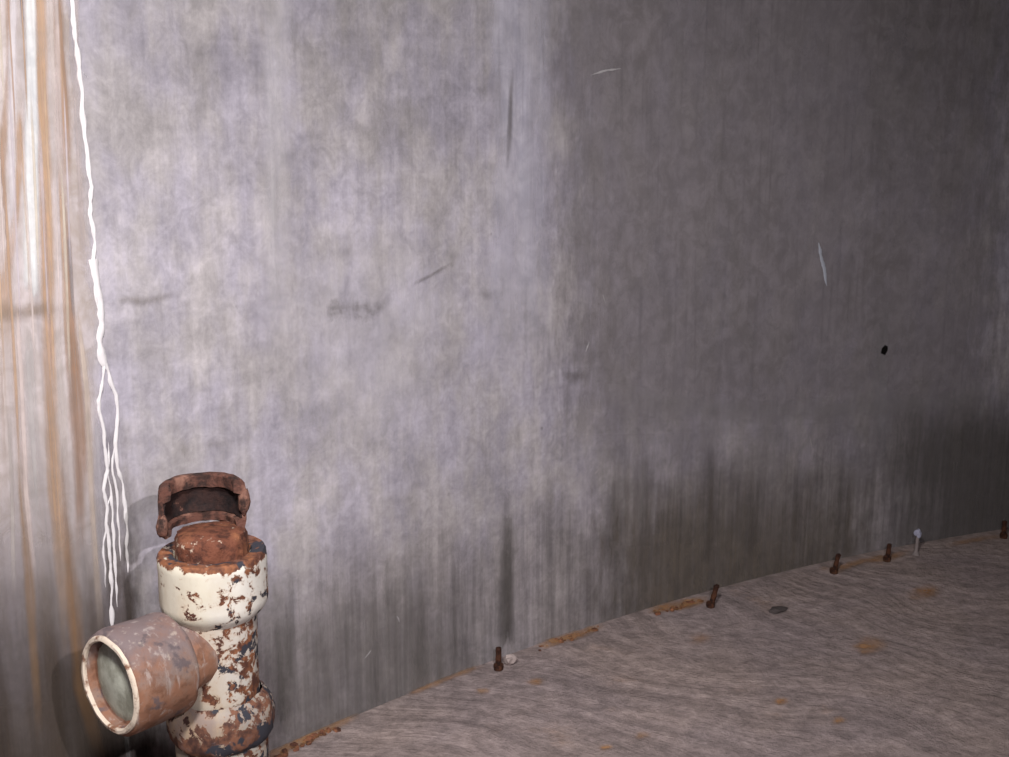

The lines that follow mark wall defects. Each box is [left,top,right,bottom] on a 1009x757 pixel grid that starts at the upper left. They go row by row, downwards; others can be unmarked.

rust [0,0,95,537]
crack [70,0,129,626]
damp [614,504,851,615]